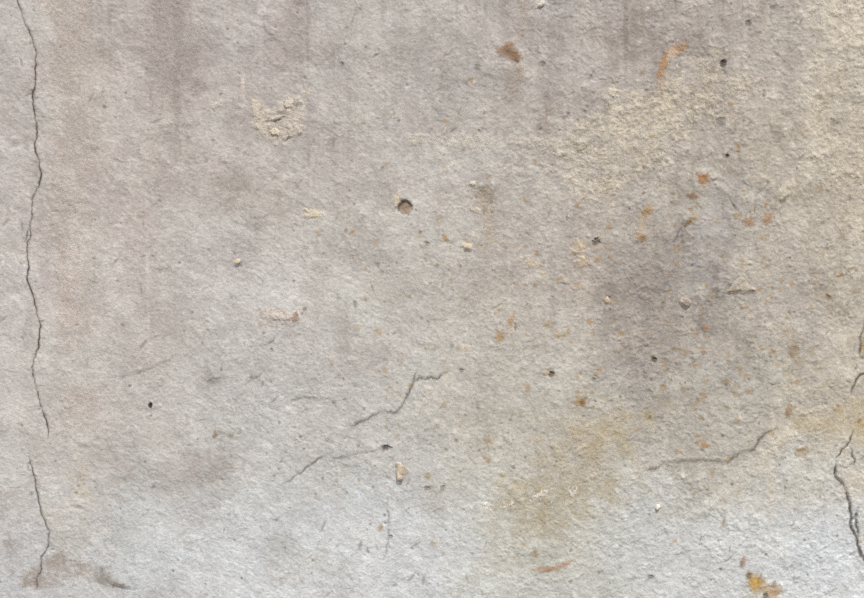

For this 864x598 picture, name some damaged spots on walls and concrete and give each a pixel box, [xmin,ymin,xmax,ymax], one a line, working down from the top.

crack [28,28,42,197]
rust [497,42,520,62]
crack [26,230,41,351]
crack [32,467,49,575]
rust [740,557,780,598]
crack [834,435,864,560]